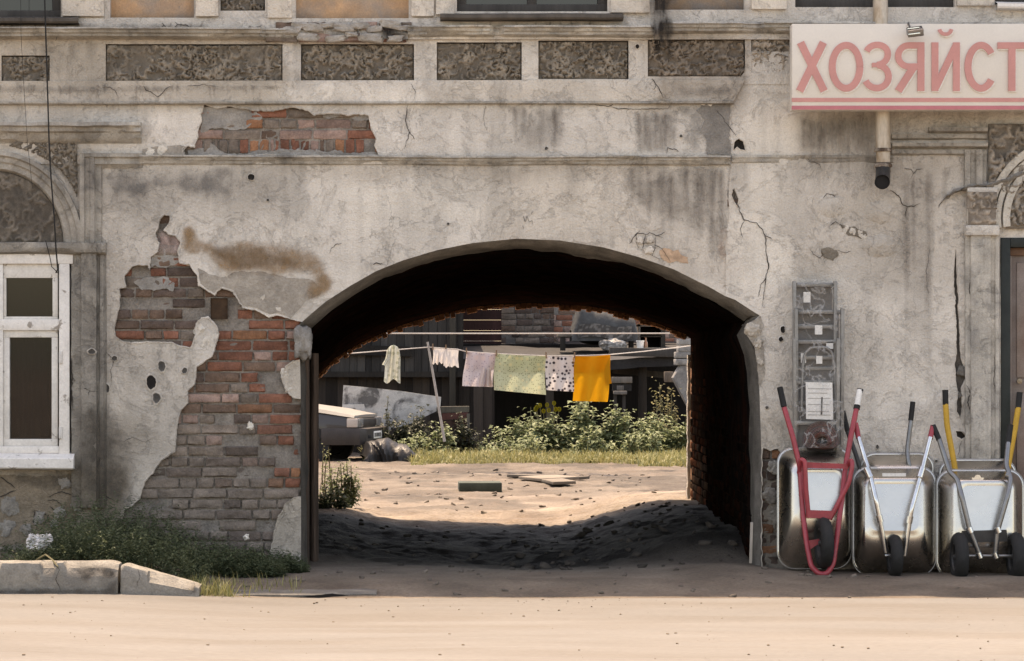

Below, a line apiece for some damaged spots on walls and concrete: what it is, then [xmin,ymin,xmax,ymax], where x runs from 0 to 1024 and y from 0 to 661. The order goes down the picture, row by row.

peeling [282,19,404,44]
spalling [142,105,379,155]
crack [629,232,669,259]
crack [732,189,772,299]
peeling [830,222,867,240]
spalling [113,214,321,566]